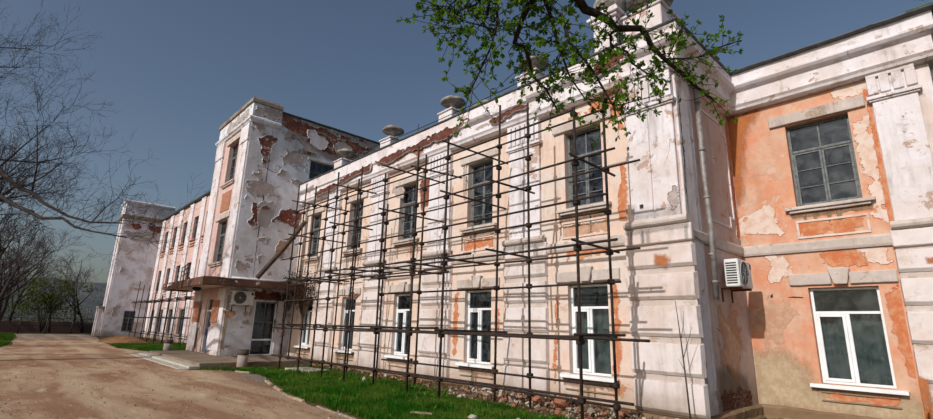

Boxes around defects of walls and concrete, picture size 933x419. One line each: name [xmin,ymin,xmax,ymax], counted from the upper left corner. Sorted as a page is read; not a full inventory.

flaking render [226,105,468,230]
flaking render [475,104,527,131]
peeling [617,165,628,222]
peeling [723,122,787,241]
peeling [799,80,894,236]
peeling [235,237,292,282]
peeling [465,237,493,251]
peeling [819,247,894,268]
peeling [452,292,460,356]
peeling [612,283,623,395]
peeling [717,254,800,412]
peeling [884,282,916,378]